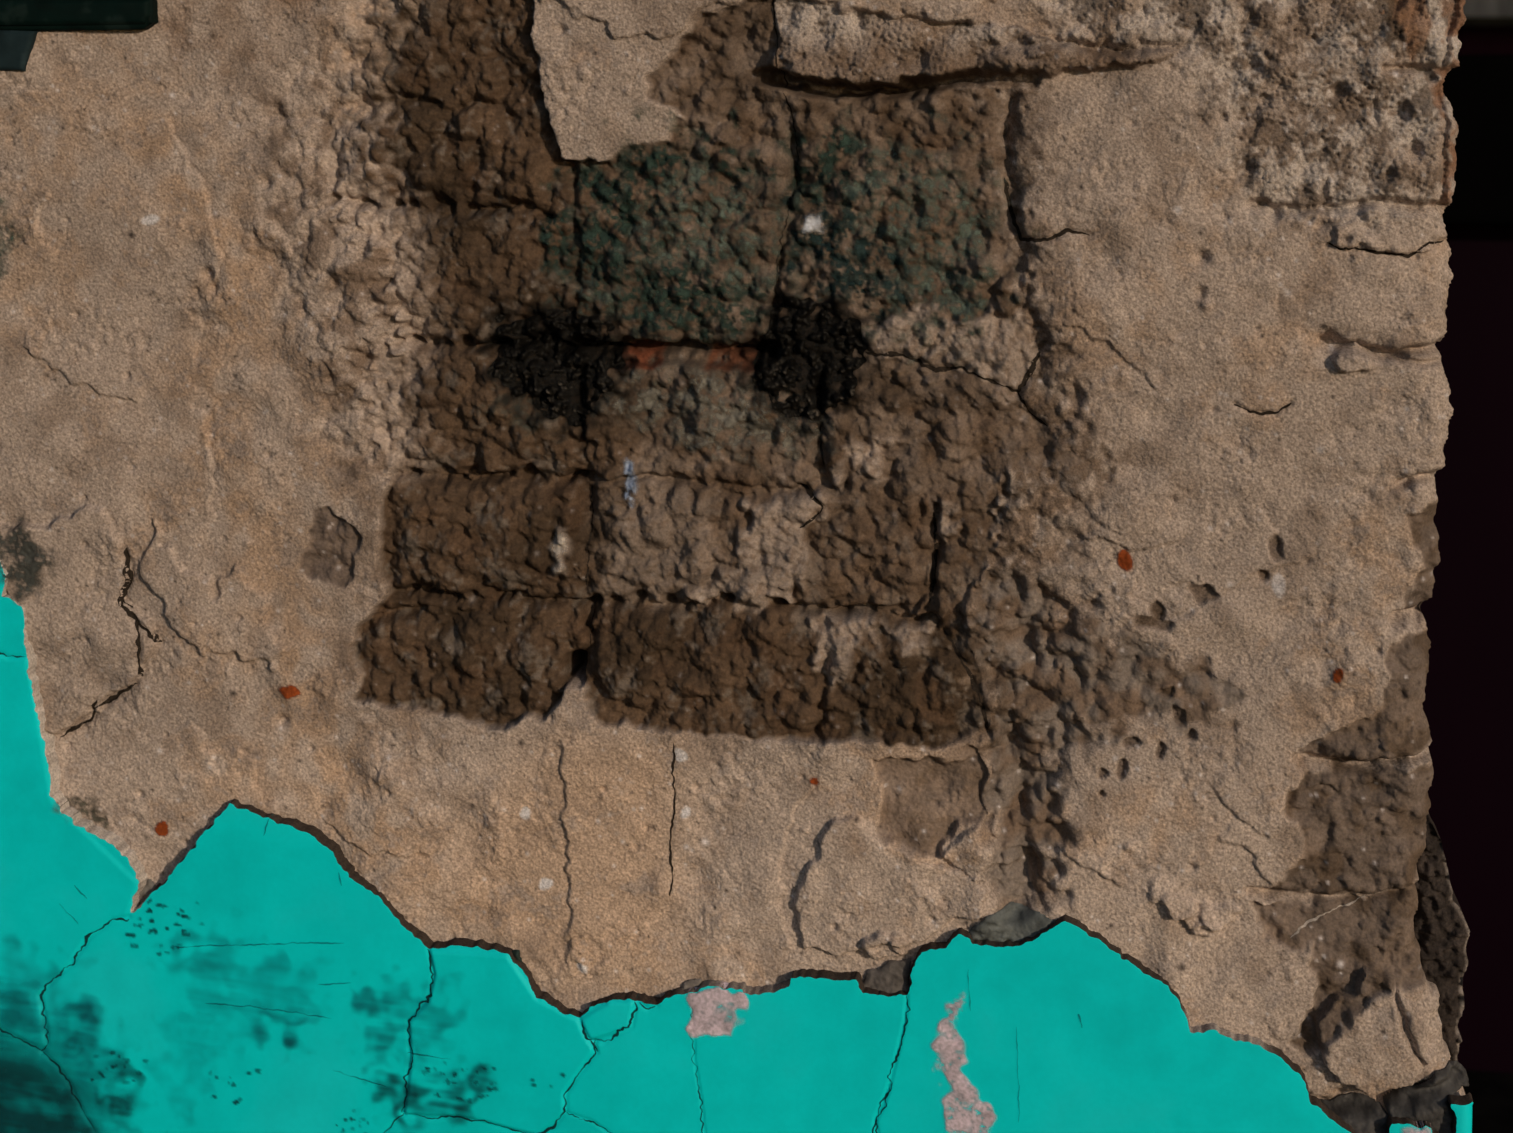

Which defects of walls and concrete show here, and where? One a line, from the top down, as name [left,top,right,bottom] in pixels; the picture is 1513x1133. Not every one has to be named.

crack [1004,178,1090,243]
damp [593,367,834,460]
spalling [299,0,1466,910]
rust [1118,550,1133,571]
crack [61,548,162,737]
peeling [0,560,196,913]
rust [279,685,300,699]
rust [155,821,168,836]
crack [668,743,676,896]
spalling [206,630,1473,1133]
damp [380,1075,425,1111]
damp [441,1066,486,1120]